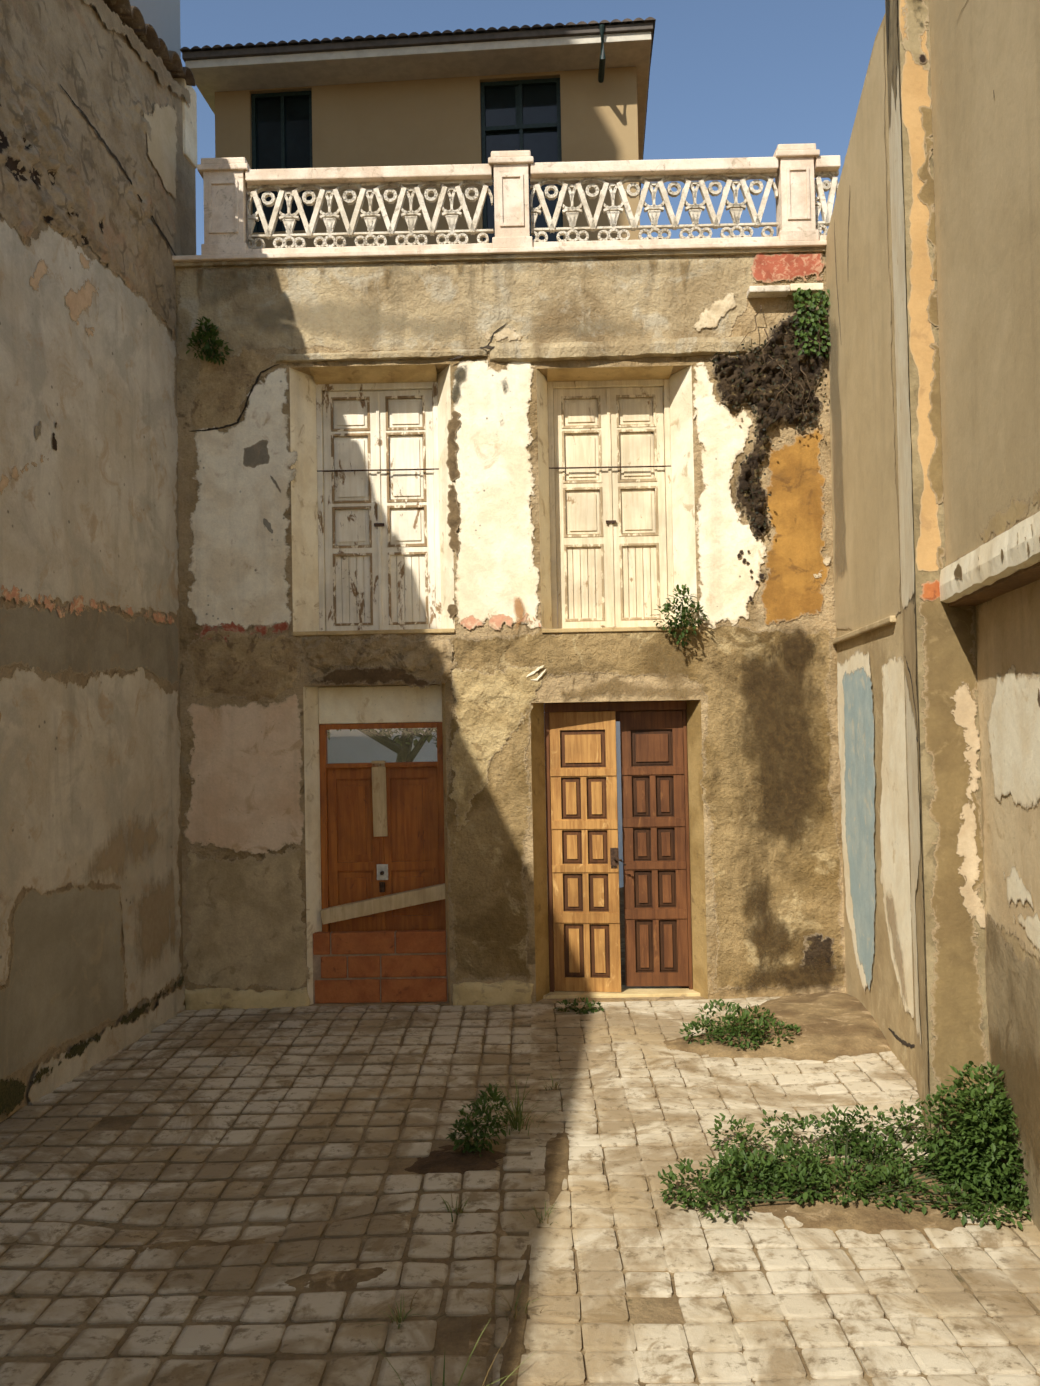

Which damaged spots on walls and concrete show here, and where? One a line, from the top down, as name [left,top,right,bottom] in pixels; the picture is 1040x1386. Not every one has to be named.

flaking render [0,0,275,432]
crack [190,364,280,432]
flaking render [243,440,281,493]
crack [450,324,506,360]
flaking render [917,106,944,504]
peeling [460,613,541,630]
flaking render [185,621,542,849]
water stain [741,628,823,845]
water stain [746,876,834,992]
flaking render [837,649,921,1045]
flaking render [950,665,1040,1081]
flaking render [995,1096,1040,1231]